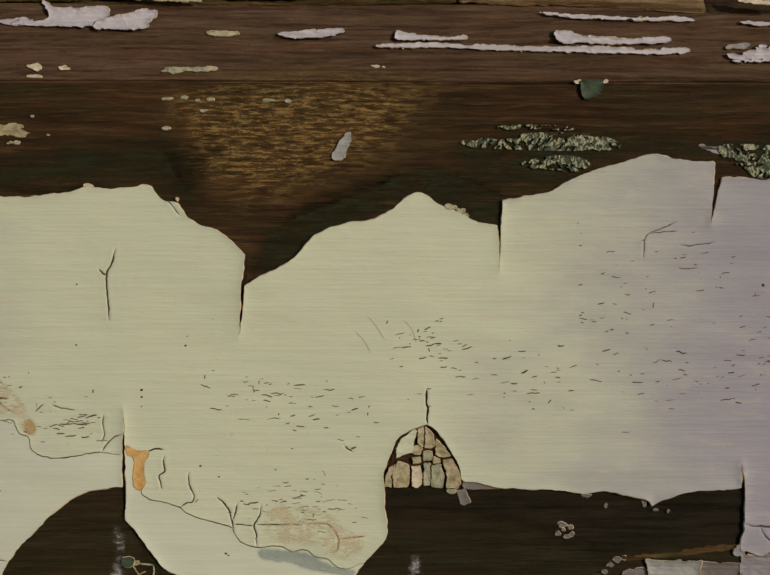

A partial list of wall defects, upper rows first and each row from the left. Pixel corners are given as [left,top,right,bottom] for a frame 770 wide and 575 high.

peeling [0,0,202,31]
peeling [539,11,695,22]
peeling [375,30,690,55]
peeling [725,43,770,64]
damp [459,134,770,181]
crack [710,188,718,219]
crack [99,251,115,317]
crack [239,273,247,322]
crack [386,251,770,410]
crack [0,372,379,569]
peeling [2,445,171,575]
peeling [356,426,770,575]